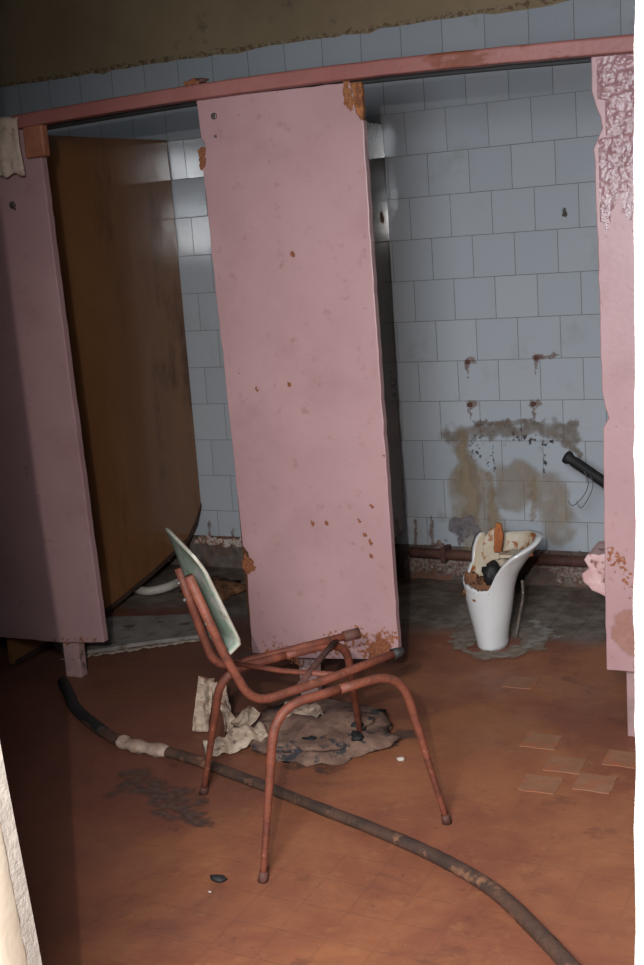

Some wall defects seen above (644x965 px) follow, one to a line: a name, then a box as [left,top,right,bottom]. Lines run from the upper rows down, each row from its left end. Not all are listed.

corrosion [342,81,357,112]
leakage [444,419,582,545]
corrosion [314,625,399,659]